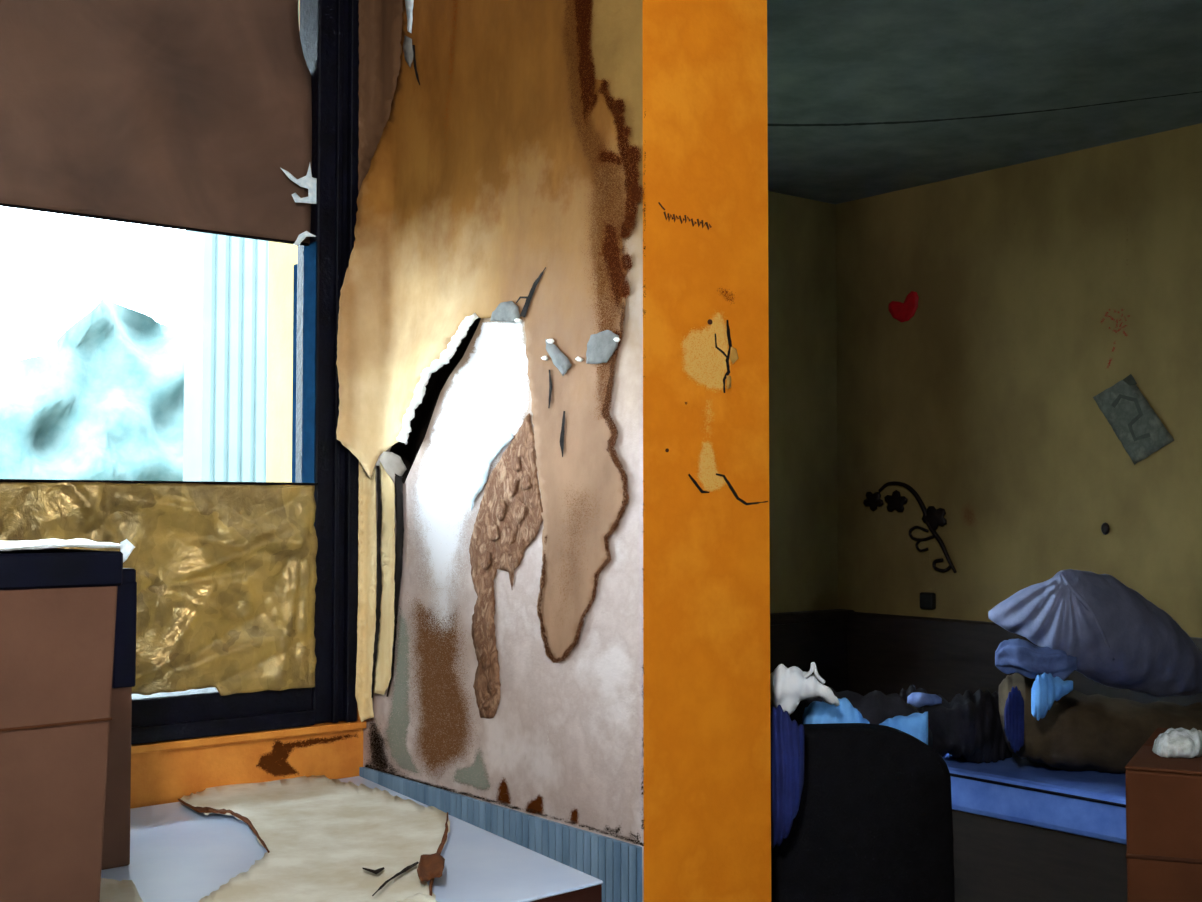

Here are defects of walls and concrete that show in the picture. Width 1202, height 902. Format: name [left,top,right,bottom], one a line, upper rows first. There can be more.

peeling [403,36,413,68]
spalling [355,318,554,722]
peeling [681,312,738,493]
crack [688,473,768,505]